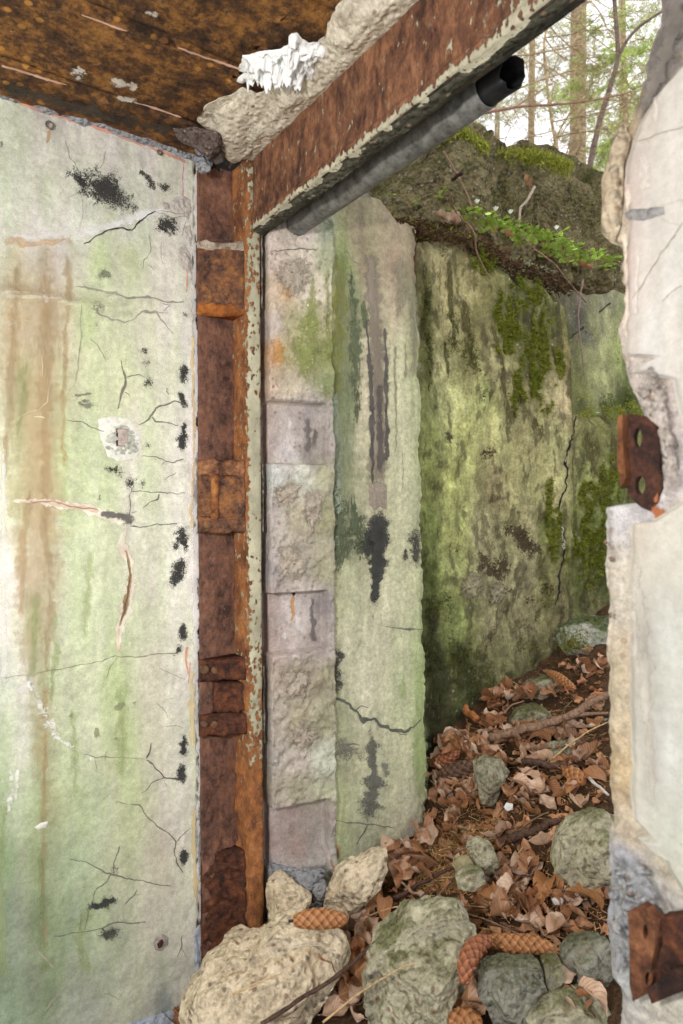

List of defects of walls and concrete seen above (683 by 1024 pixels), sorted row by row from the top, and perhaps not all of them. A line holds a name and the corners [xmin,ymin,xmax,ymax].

water stain [6,77,185,196]
water stain [65,165,138,215]
water stain [325,254,431,483]
spalling [98,417,141,461]
spalling [637,367,679,495]
water stain [335,428,424,617]
crack [555,416,577,606]
corrosion [651,493,664,518]
corrosion [212,680,244,713]
water stain [356,728,390,823]
crack [336,697,421,747]
corrosion [201,845,247,963]